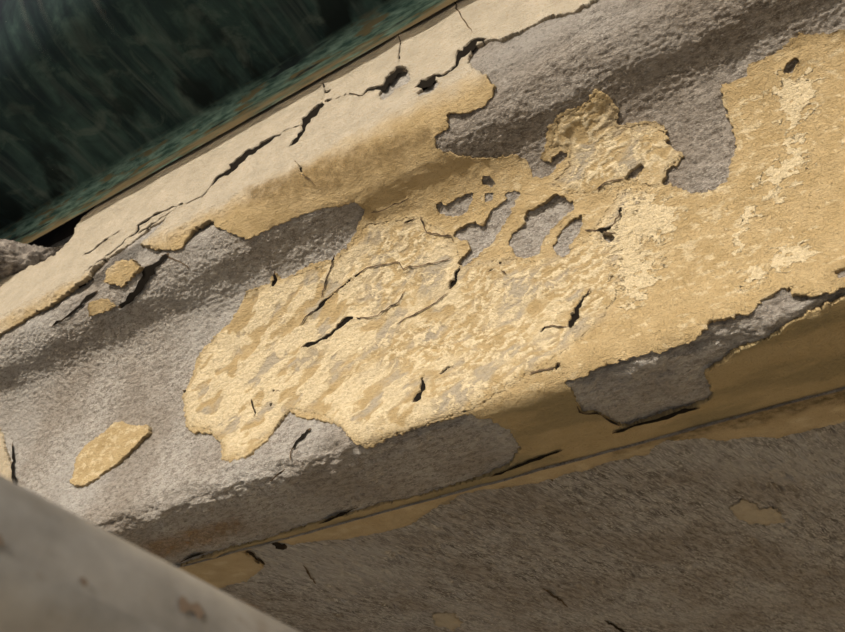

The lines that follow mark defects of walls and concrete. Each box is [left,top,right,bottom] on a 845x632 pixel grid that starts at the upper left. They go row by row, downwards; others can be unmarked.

crack [201,2,486,198]
spalling [435,0,845,193]
peeling [725,59,825,256]
crack [52,290,98,327]
crack [118,253,188,308]
spalling [0,202,520,565]
crack [301,255,460,347]
crack [413,367,450,402]
spalling [509,195,583,259]
crack [541,289,590,332]
peeling [593,166,688,311]
spalling [565,288,845,424]